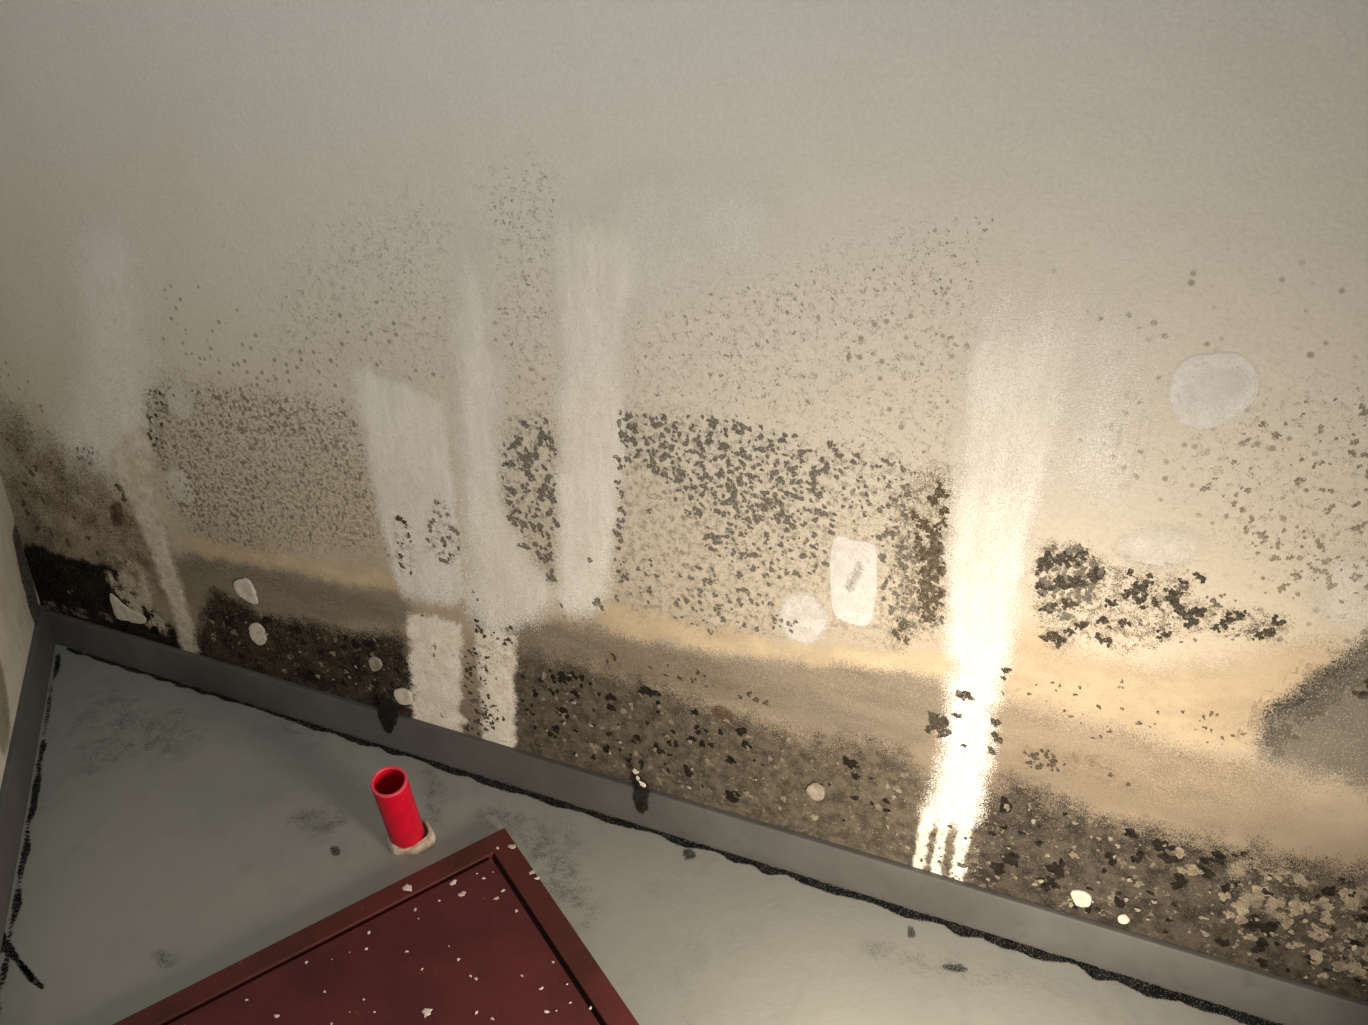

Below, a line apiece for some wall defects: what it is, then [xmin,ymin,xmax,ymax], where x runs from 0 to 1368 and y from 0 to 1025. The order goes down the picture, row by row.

leakage [0,140,563,722]